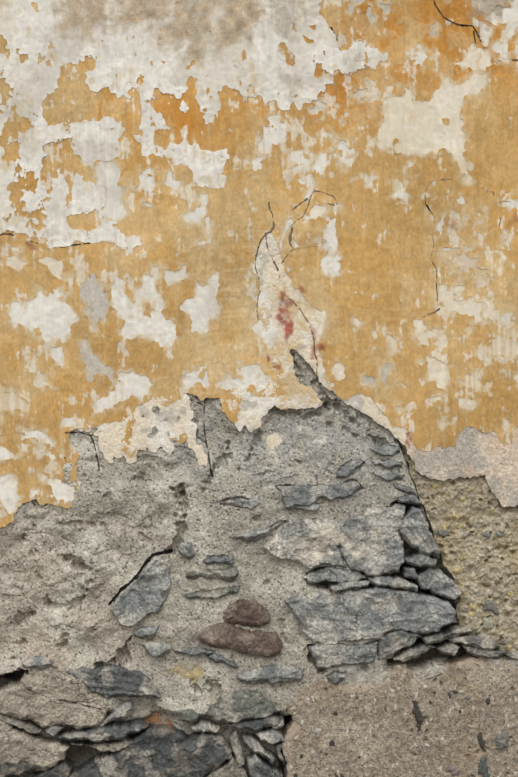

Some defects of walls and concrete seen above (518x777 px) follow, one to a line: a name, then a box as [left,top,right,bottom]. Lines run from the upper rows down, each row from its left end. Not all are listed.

peeling [376,0,518,184]
crack [433,0,487,49]
peeling [0,0,391,366]
crack [255,190,337,374]
peeling [392,179,409,204]
peeling [436,206,487,235]
crack [422,175,518,318]
peeling [501,198,518,210]
spalling [0,218,518,663]